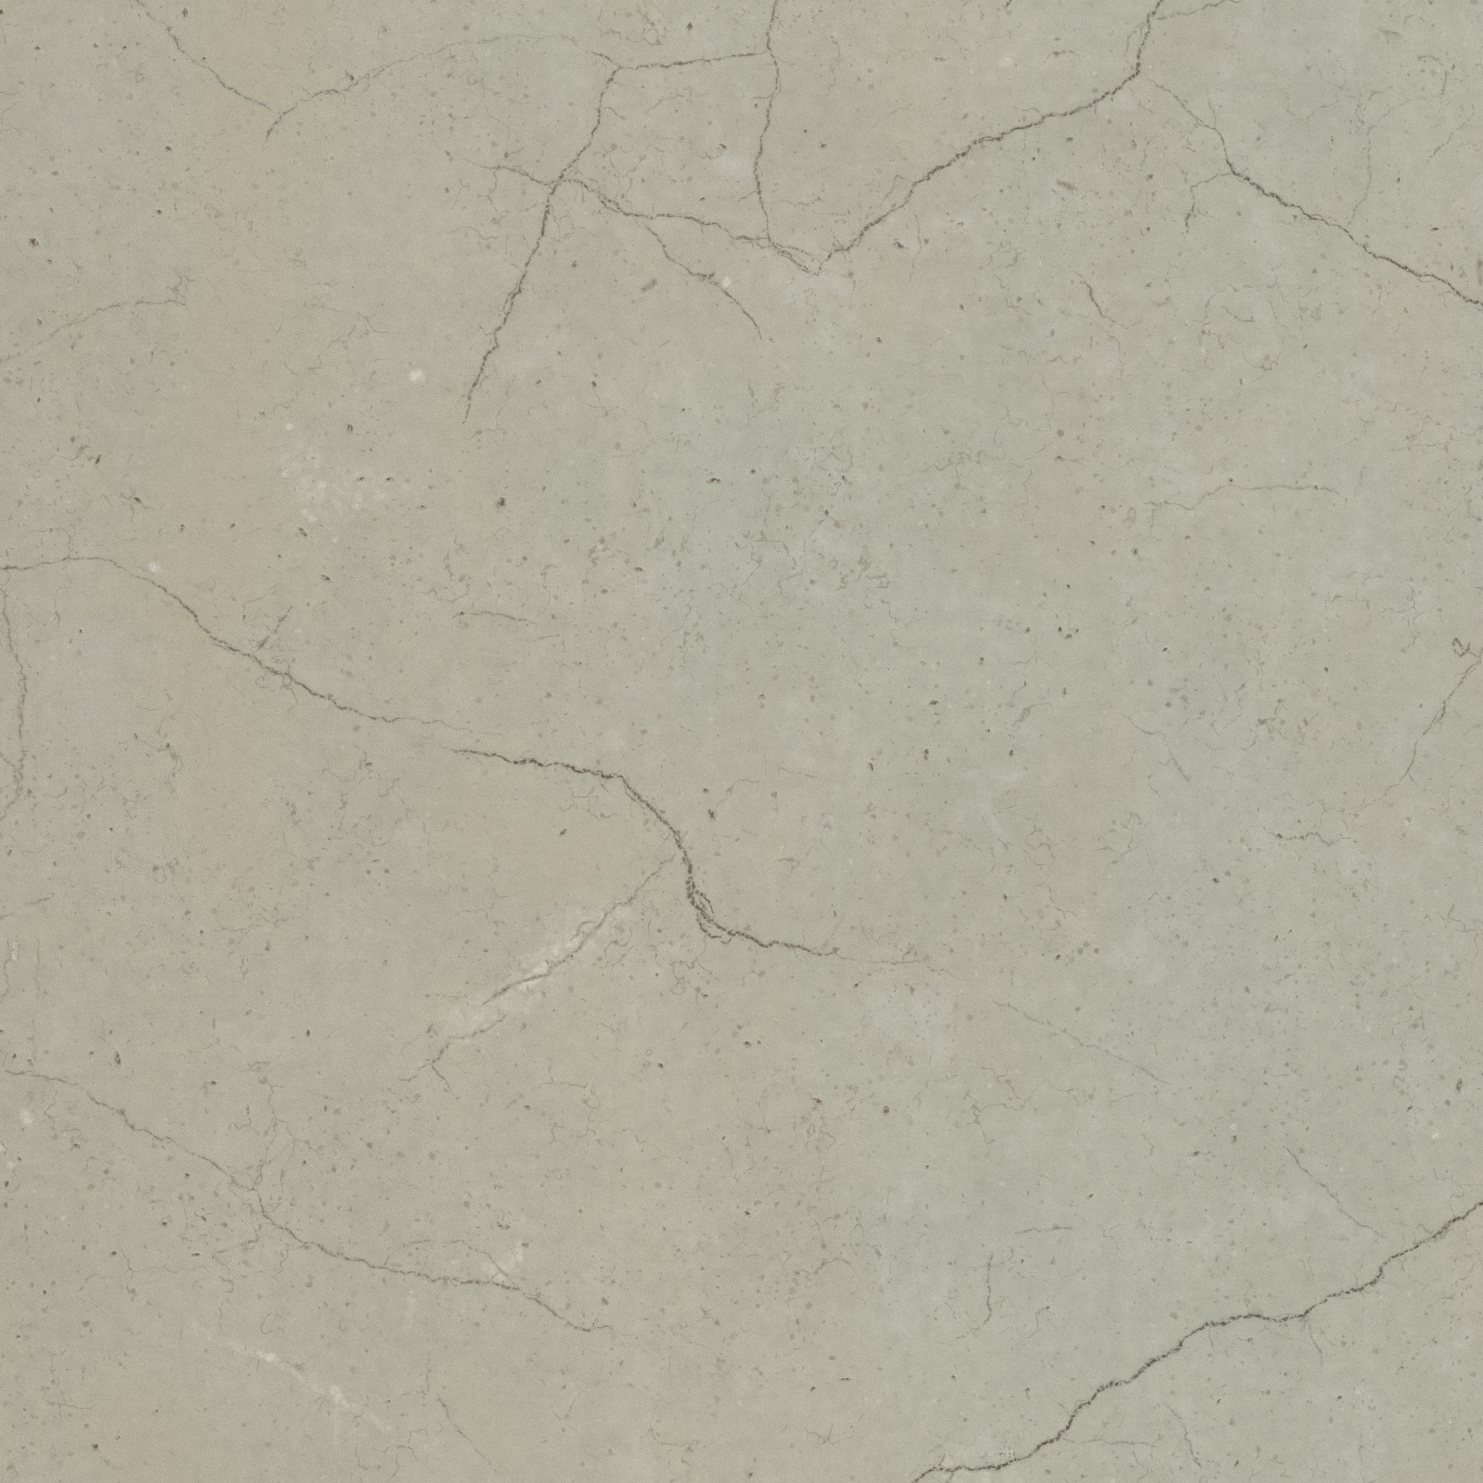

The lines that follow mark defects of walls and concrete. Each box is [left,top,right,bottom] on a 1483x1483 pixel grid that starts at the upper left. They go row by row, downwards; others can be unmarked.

crack [133,0,1483,424]
crack [0,281,190,364]
crack [1143,482,1342,513]
crack [0,555,1171,1091]
crack [1118,713,1194,789]
crack [1267,635,1483,848]
crack [0,897,642,1338]
crack [907,1146,1483,1483]
crack [425,1388,497,1474]